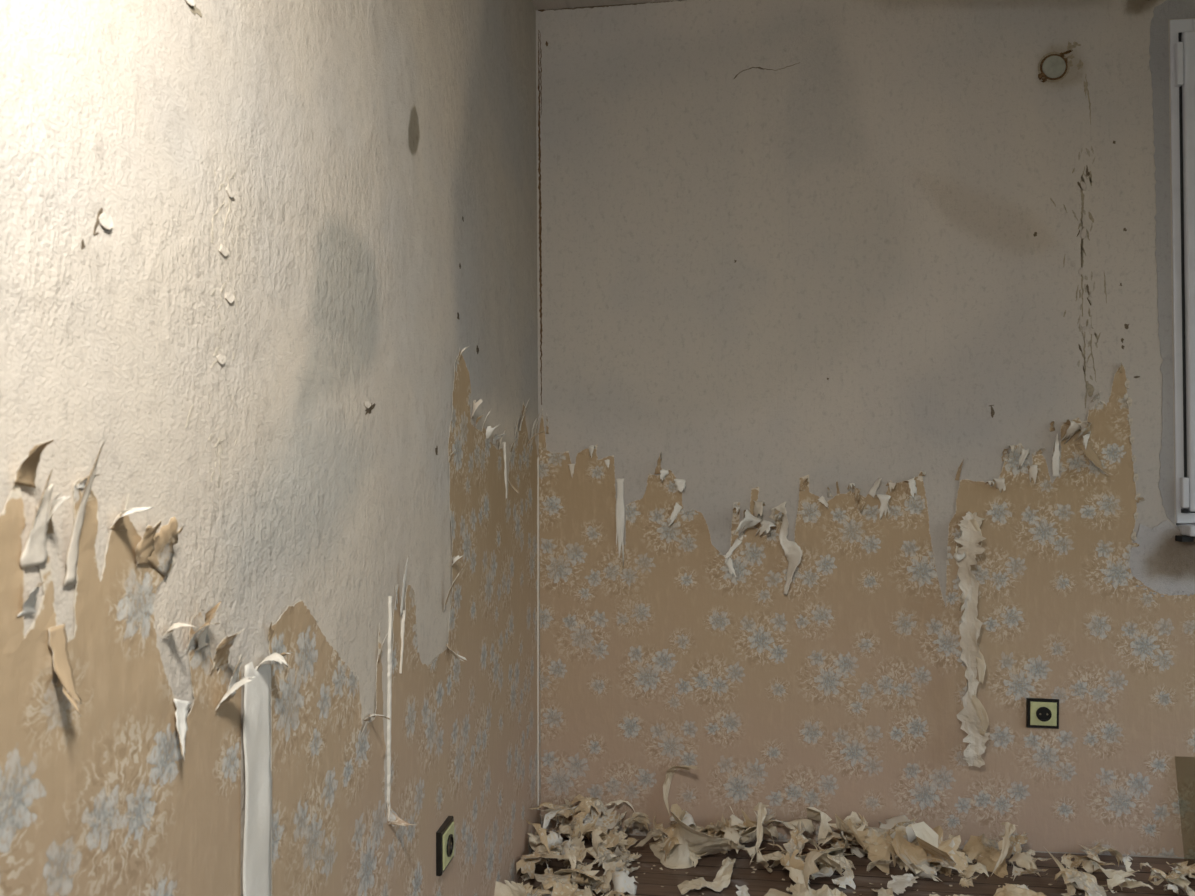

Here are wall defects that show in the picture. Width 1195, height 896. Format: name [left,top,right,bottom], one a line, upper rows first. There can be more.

crack [734,62,800,79]
crack [1050,77,1107,408]